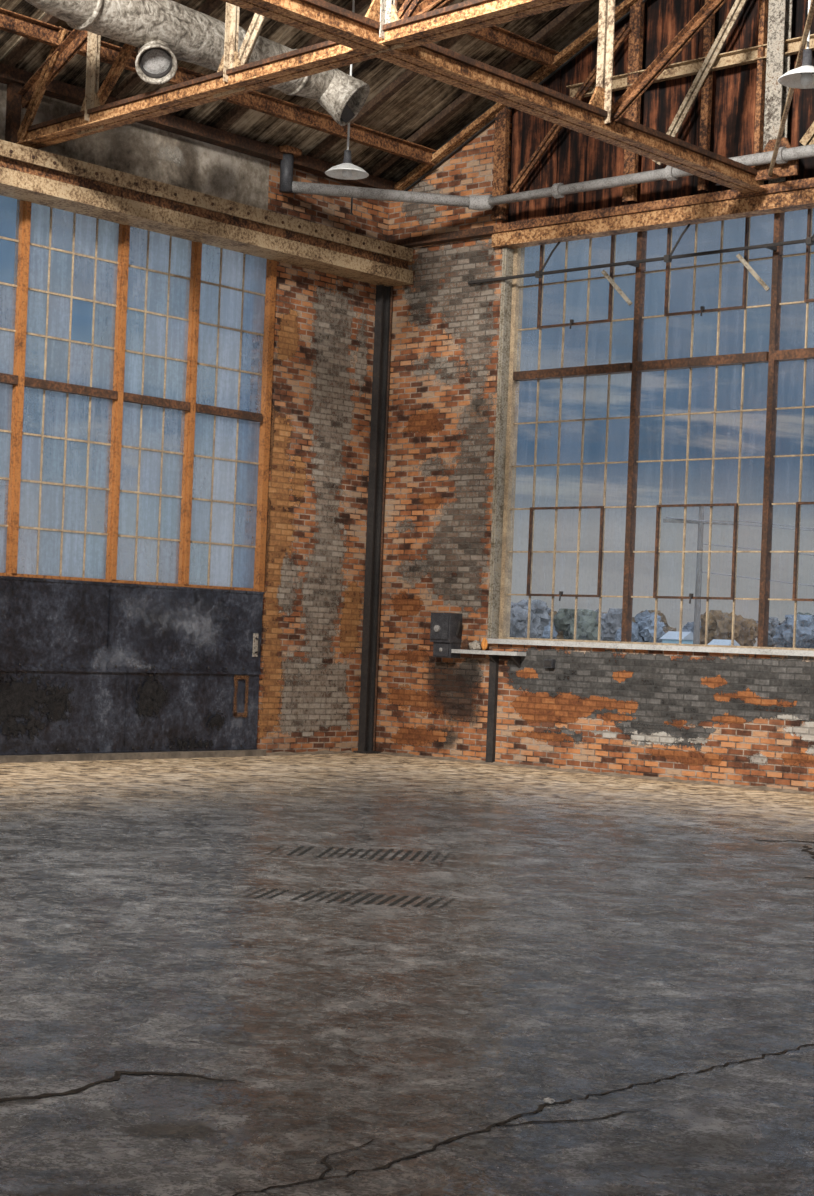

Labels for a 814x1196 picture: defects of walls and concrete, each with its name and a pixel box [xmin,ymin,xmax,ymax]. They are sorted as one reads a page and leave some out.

peeling [506,646,814,766]
crack [754,839,814,878]
crack [0,1071,237,1106]
crack [232,1043,814,1196]